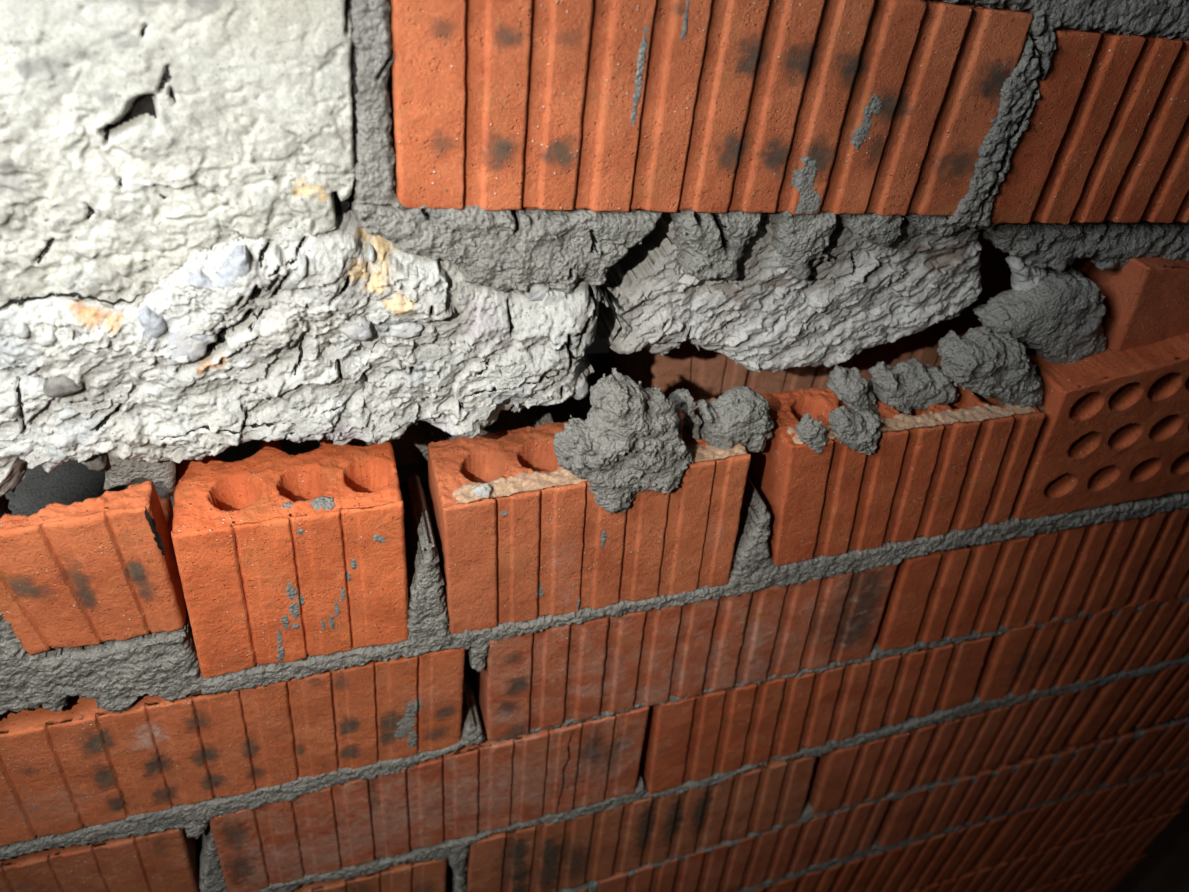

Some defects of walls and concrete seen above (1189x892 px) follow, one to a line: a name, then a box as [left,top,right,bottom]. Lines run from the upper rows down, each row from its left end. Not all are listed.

spalling [103,65,175,141]
spalling [1005,256,1048,291]
spalling [0,192,982,498]